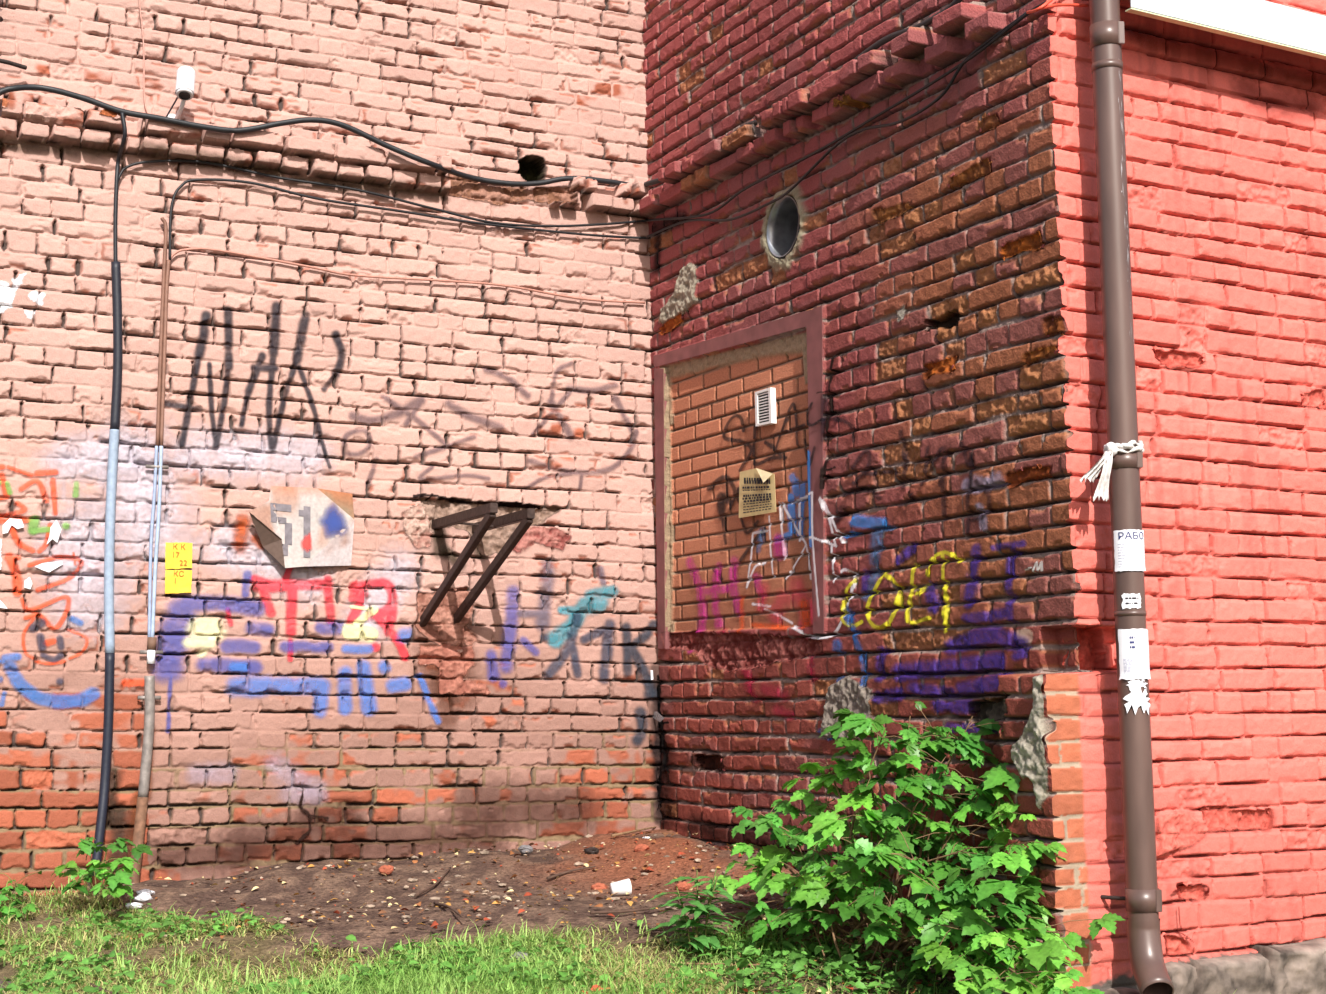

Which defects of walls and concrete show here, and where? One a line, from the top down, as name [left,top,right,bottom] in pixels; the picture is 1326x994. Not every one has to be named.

spalling [659,313,684,335]
spalling [930,312,964,329]
flaking render [402,498,571,556]
spalling [698,754,725,771]
spalling [1155,806,1274,857]
spalling [1161,932,1197,956]